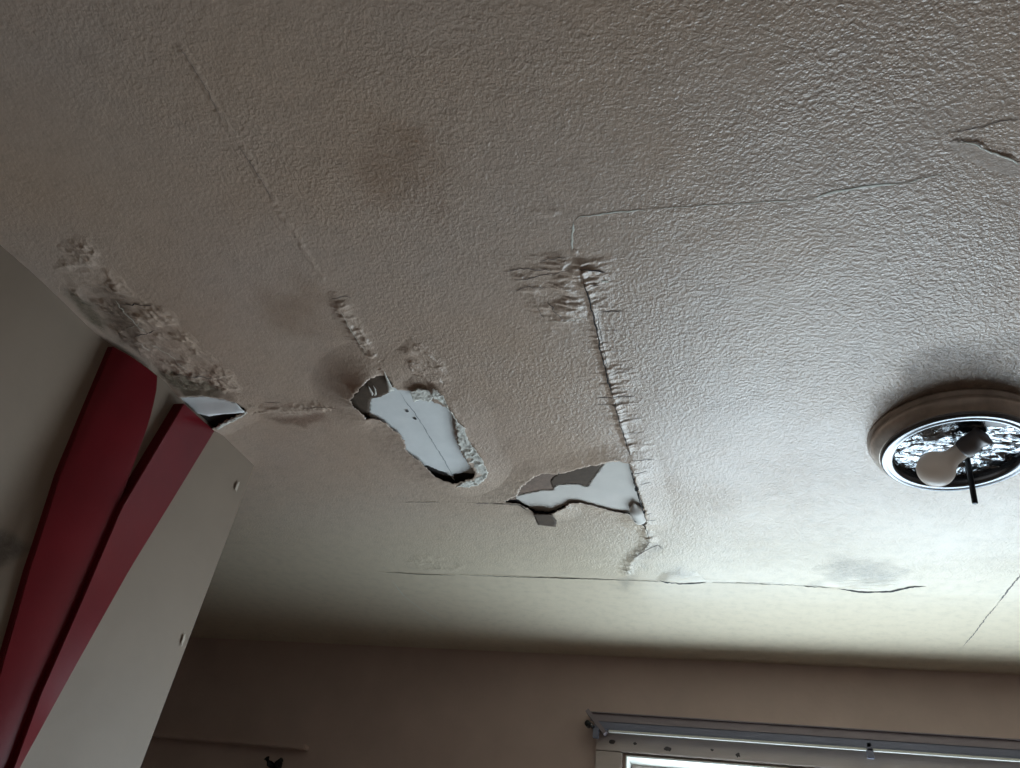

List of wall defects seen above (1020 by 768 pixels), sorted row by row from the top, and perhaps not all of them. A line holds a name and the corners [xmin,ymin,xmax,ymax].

crack [570,173,945,455]
flaking render [168,384,262,436]
flaking render [309,343,673,532]
crack [378,522,926,593]